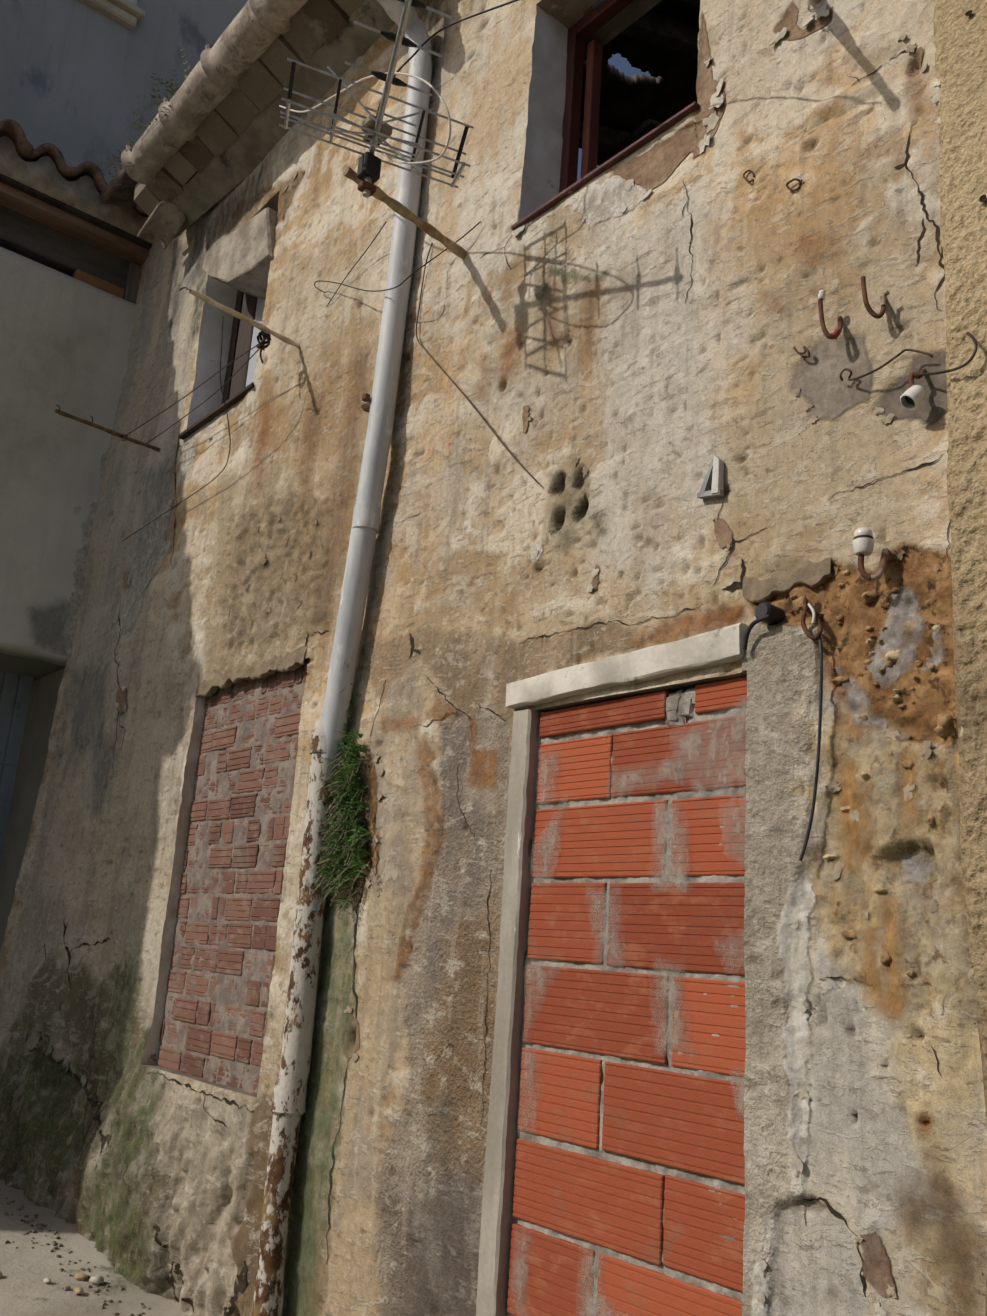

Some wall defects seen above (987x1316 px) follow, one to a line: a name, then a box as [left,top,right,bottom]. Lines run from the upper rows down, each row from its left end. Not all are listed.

peeling [768,2,833,46]
peeling [572,13,726,227]
crack [894,124,945,311]
crack [828,450,948,500]
crack [519,502,766,644]
flaking render [742,542,967,1177]
crack [44,924,111,991]
crack [28,1048,111,1174]
crack [799,1197,866,1297]
peeling [855,1232,897,1316]